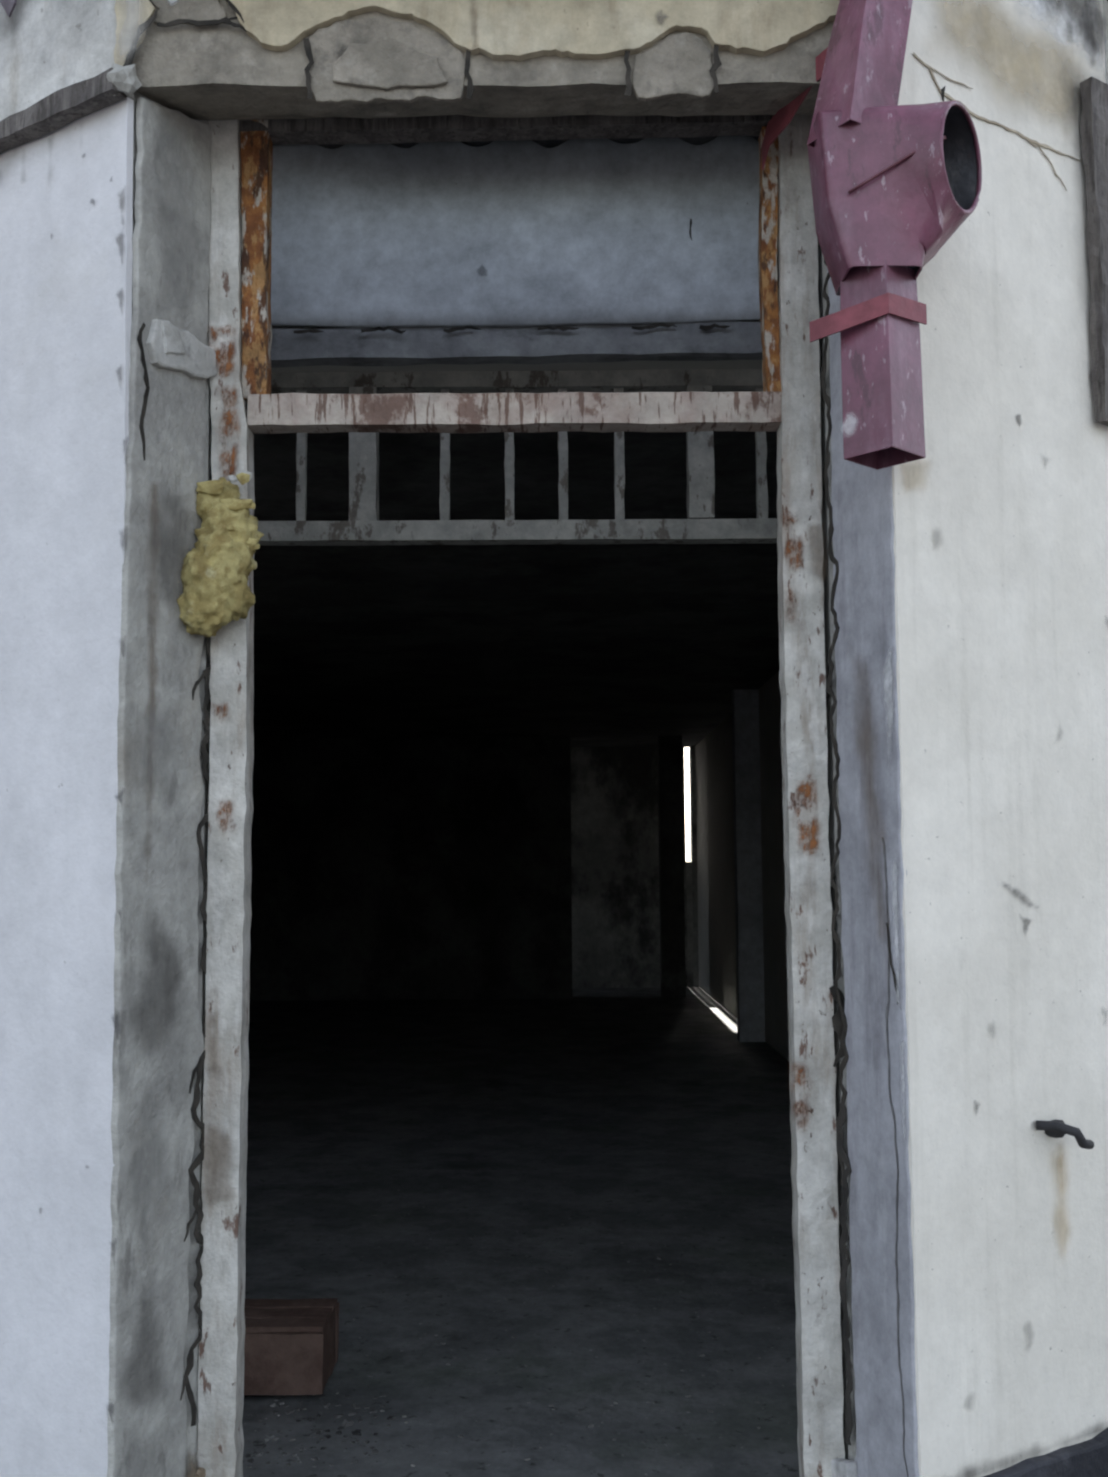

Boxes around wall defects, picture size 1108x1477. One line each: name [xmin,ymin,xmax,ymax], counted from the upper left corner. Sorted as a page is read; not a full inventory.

spalling [150,0,227,28]
spalling [309,16,466,104]
crack [913,52,1082,191]
corrosion [785,517,803,567]
crack [192,637,211,975]
corrosion [796,775,818,854]
crack [180,1010,206,1427]